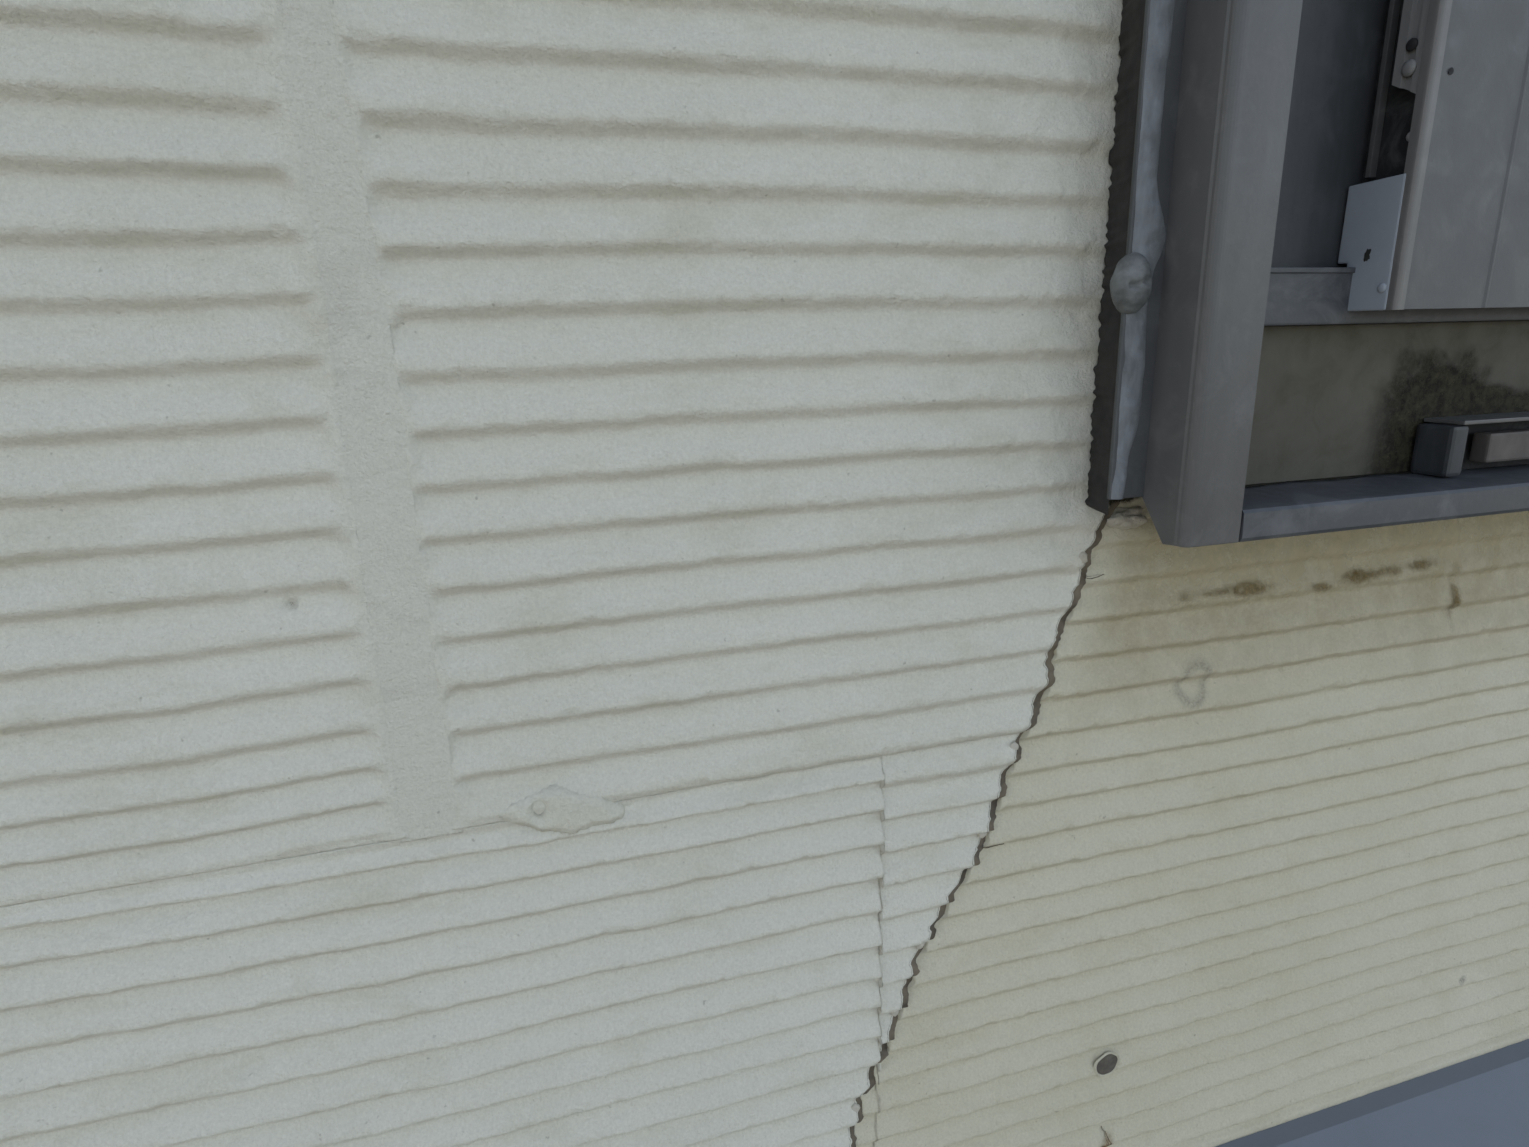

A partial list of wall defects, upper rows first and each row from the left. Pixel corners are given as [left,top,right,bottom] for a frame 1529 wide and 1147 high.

crack [848,501,1120,1147]
damp [1149,511,1528,600]